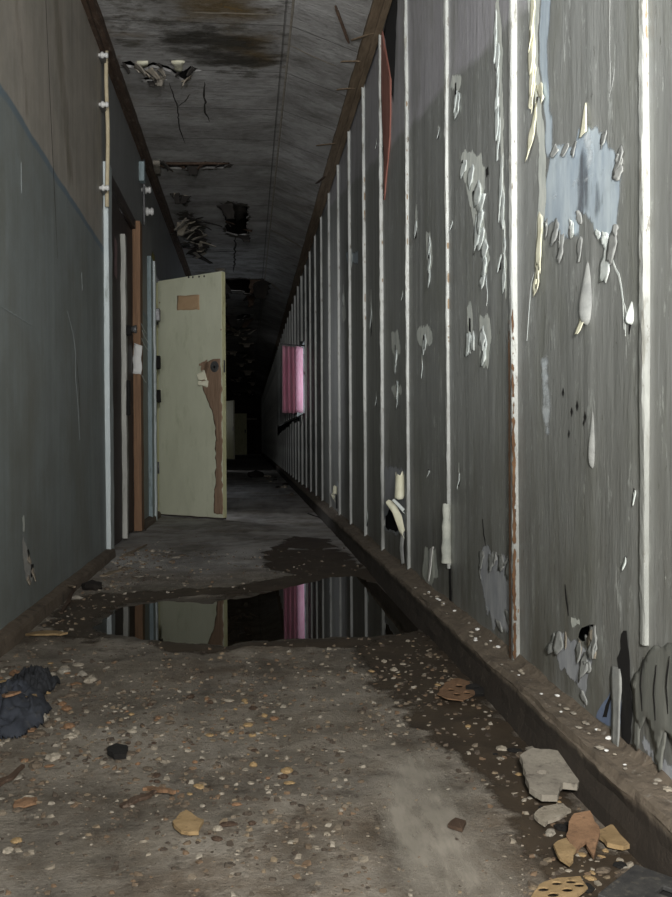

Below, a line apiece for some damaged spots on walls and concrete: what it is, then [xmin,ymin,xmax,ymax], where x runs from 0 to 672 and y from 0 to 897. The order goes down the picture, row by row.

crack [169,82,210,143]
leakage [163,31,268,67]
peeling [450,74,461,121]
peeling [460,0,507,369]
peeling [525,0,623,297]
spalling [22,515,37,585]
peeling [380,466,406,564]
corrosion [508,310,519,660]
peeling [546,617,597,708]
peeling [596,631,672,779]